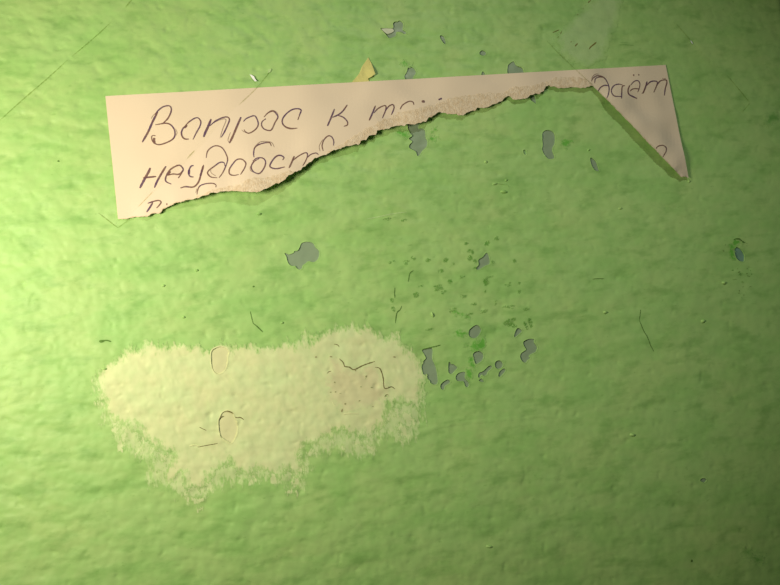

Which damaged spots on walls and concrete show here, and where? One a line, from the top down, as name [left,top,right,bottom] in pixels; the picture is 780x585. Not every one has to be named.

peeling [379,19,408,39]
peeling [506,60,525,74]
peeling [406,123,429,157]
peeling [541,129,556,160]
peeling [283,240,321,271]
peeling [513,327,539,364]
peeling [90,320,507,513]